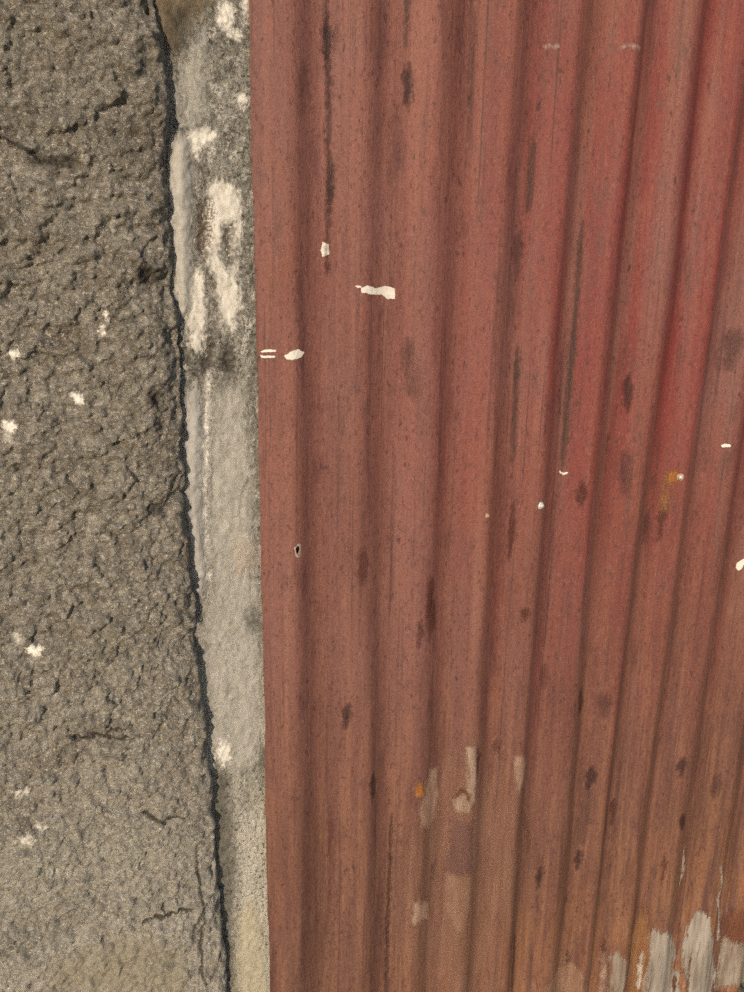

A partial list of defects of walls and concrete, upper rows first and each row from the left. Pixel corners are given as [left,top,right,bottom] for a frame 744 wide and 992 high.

leakage [185,177,243,354]
peeling [415,768,438,827]
peeling [453,747,477,813]
peeling [412,901,428,925]
corrosion [545,963,583,992]
corrosion [628,912,651,992]
peeling [608,865,744,992]